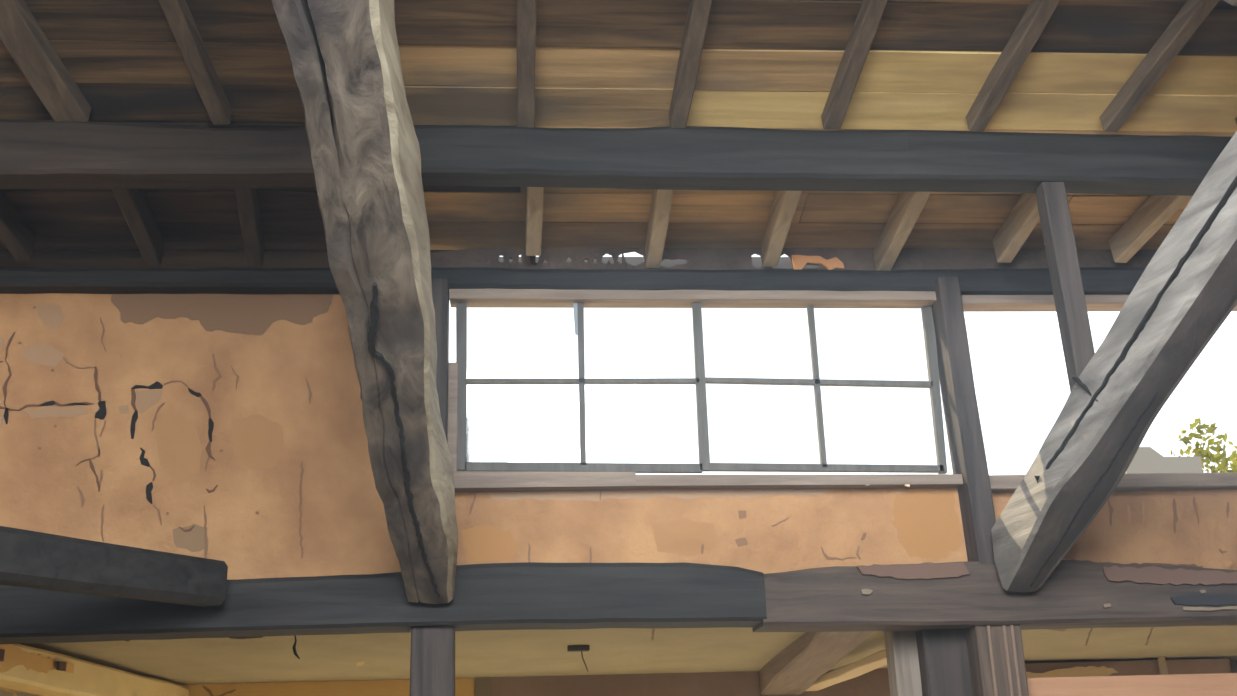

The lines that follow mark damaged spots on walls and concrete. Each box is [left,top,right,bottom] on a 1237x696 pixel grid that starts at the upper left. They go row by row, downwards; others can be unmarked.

flaking render [23,401,107,427]
crack [0,318,239,558]
peeling [0,644,57,674]